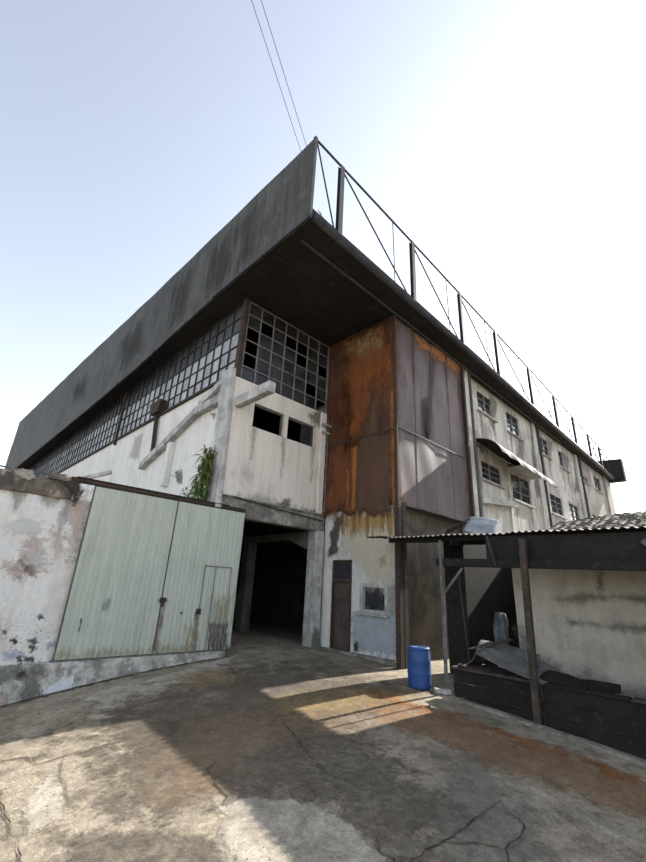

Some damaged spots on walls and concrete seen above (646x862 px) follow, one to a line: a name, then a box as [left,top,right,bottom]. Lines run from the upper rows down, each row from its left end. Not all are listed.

rust [412,330,466,410]
rust [322,324,402,536]
spalling [12,467,38,482]
leakage [276,687,408,714]
crack [1,738,137,804]
rust [374,691,646,818]
crack [0,794,22,862]
crack [374,800,525,862]